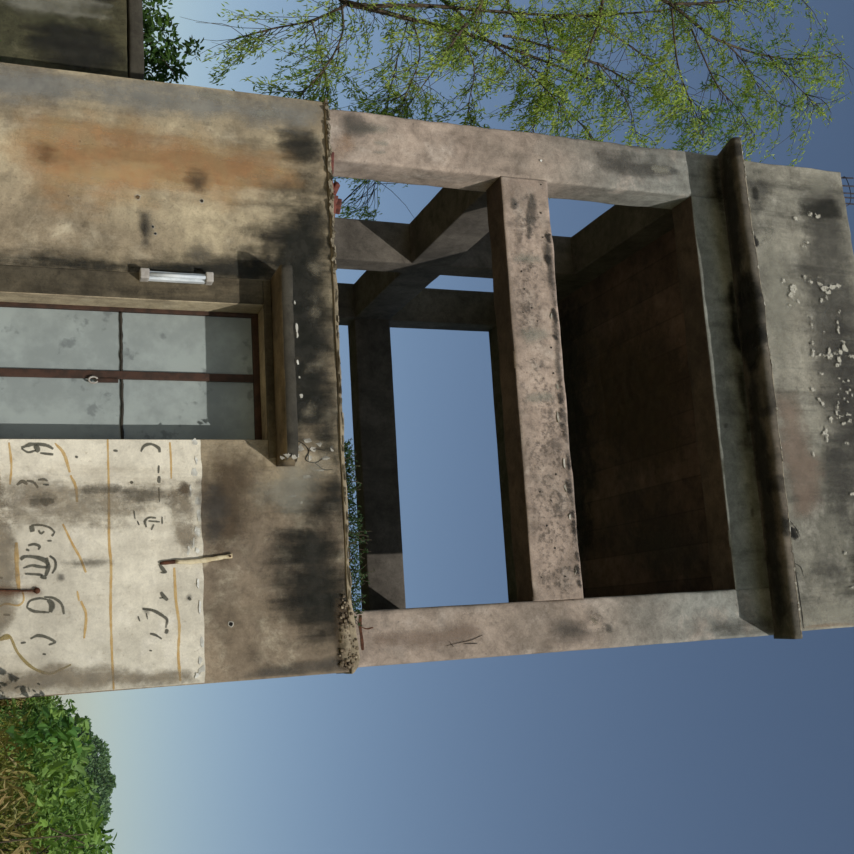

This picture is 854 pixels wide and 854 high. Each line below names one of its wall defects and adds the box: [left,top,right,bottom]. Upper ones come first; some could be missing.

leakage [0,73,320,160]
leakage [0,252,137,271]
leakage [149,204,338,462]
flaking render [782,275,841,306]
leakage [801,198,854,509]
flaking render [811,310,854,442]
leakage [204,464,248,539]
leakage [277,483,347,635]
spalling [338,465,359,669]